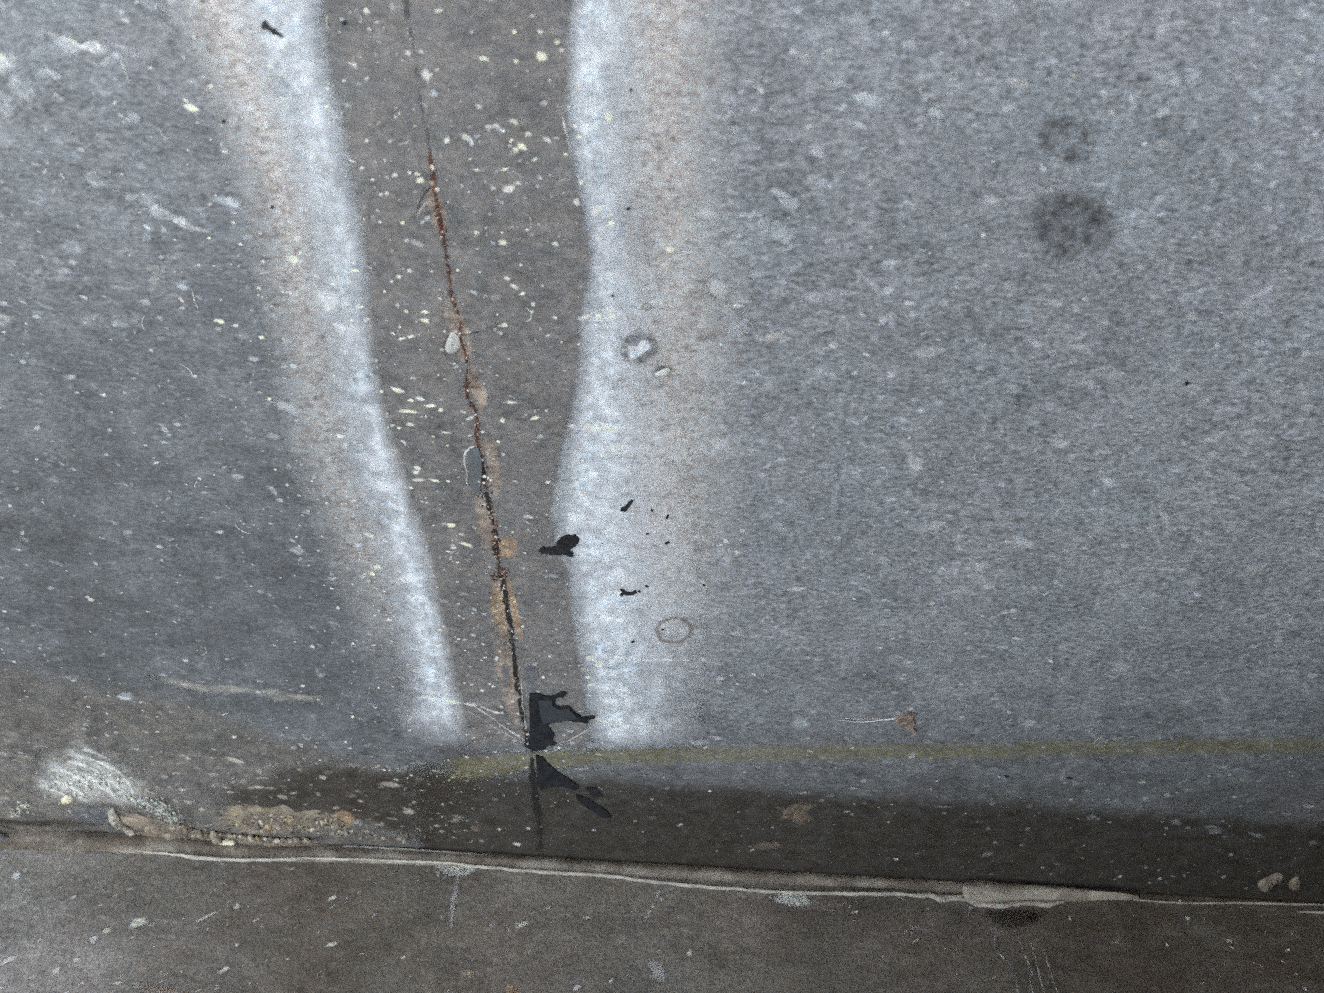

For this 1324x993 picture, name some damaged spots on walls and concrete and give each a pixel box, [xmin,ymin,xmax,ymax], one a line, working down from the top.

crack [418,137,543,850]